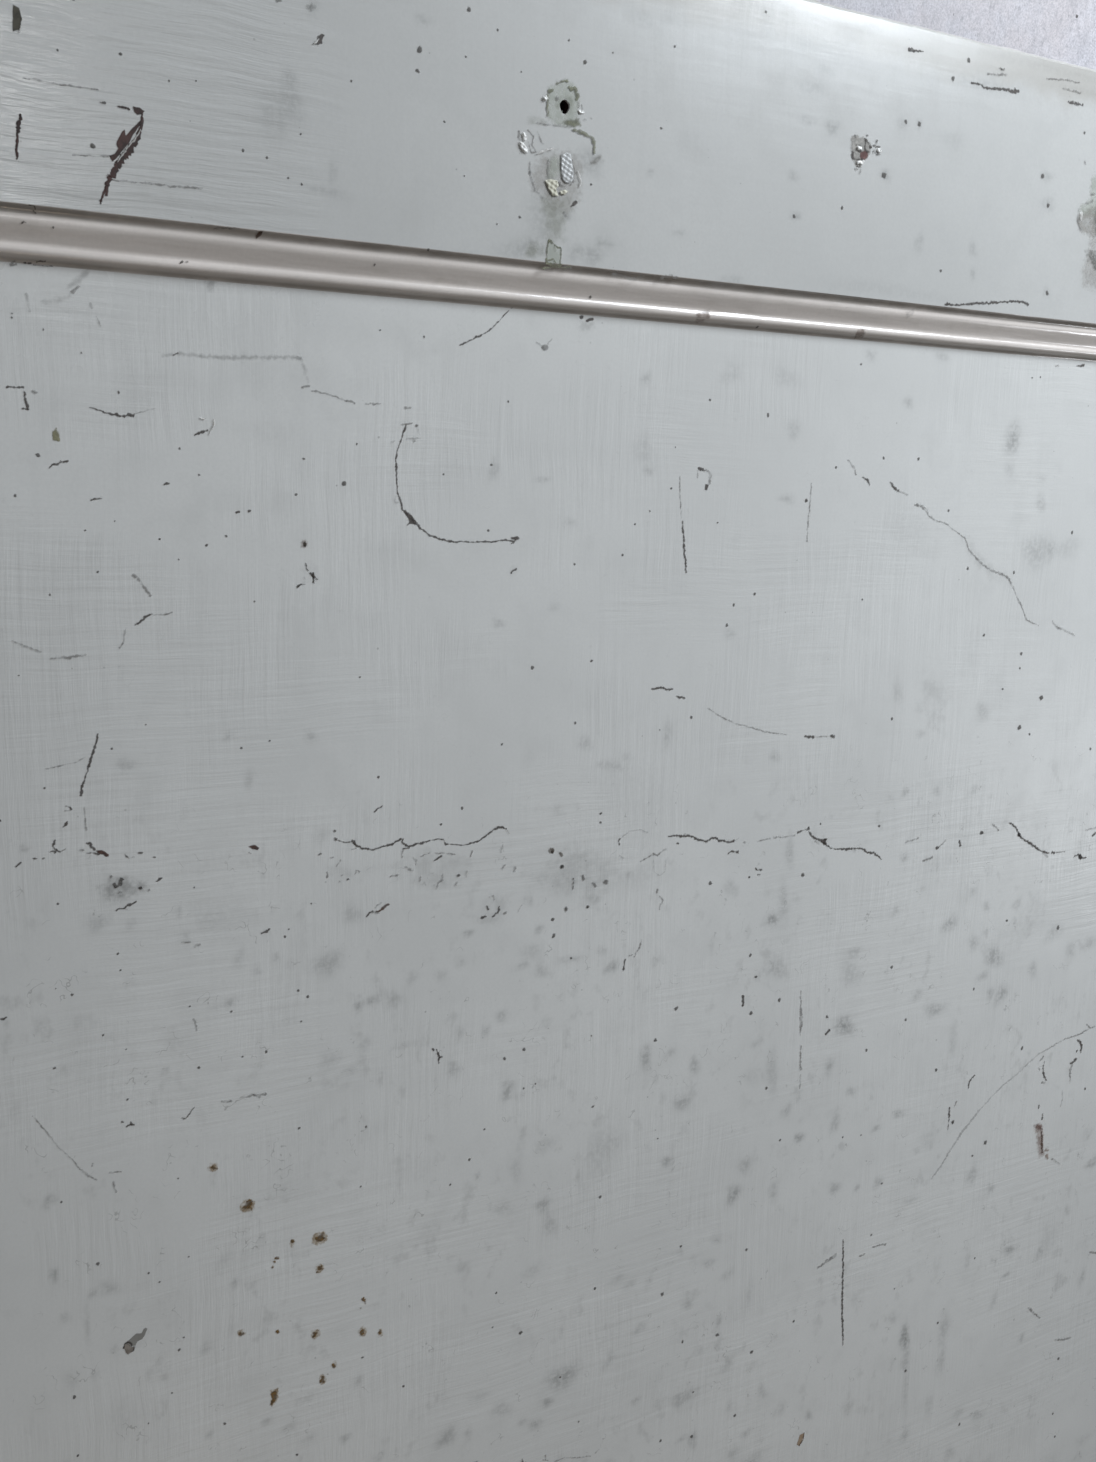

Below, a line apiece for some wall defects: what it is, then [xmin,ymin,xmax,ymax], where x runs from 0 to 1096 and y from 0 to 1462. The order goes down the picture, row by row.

peeling [518,80,600,207]
peeling [851,135,882,169]
crack [334,826,507,850]
crack [797,827,881,859]
crack [918,823,1096,861]